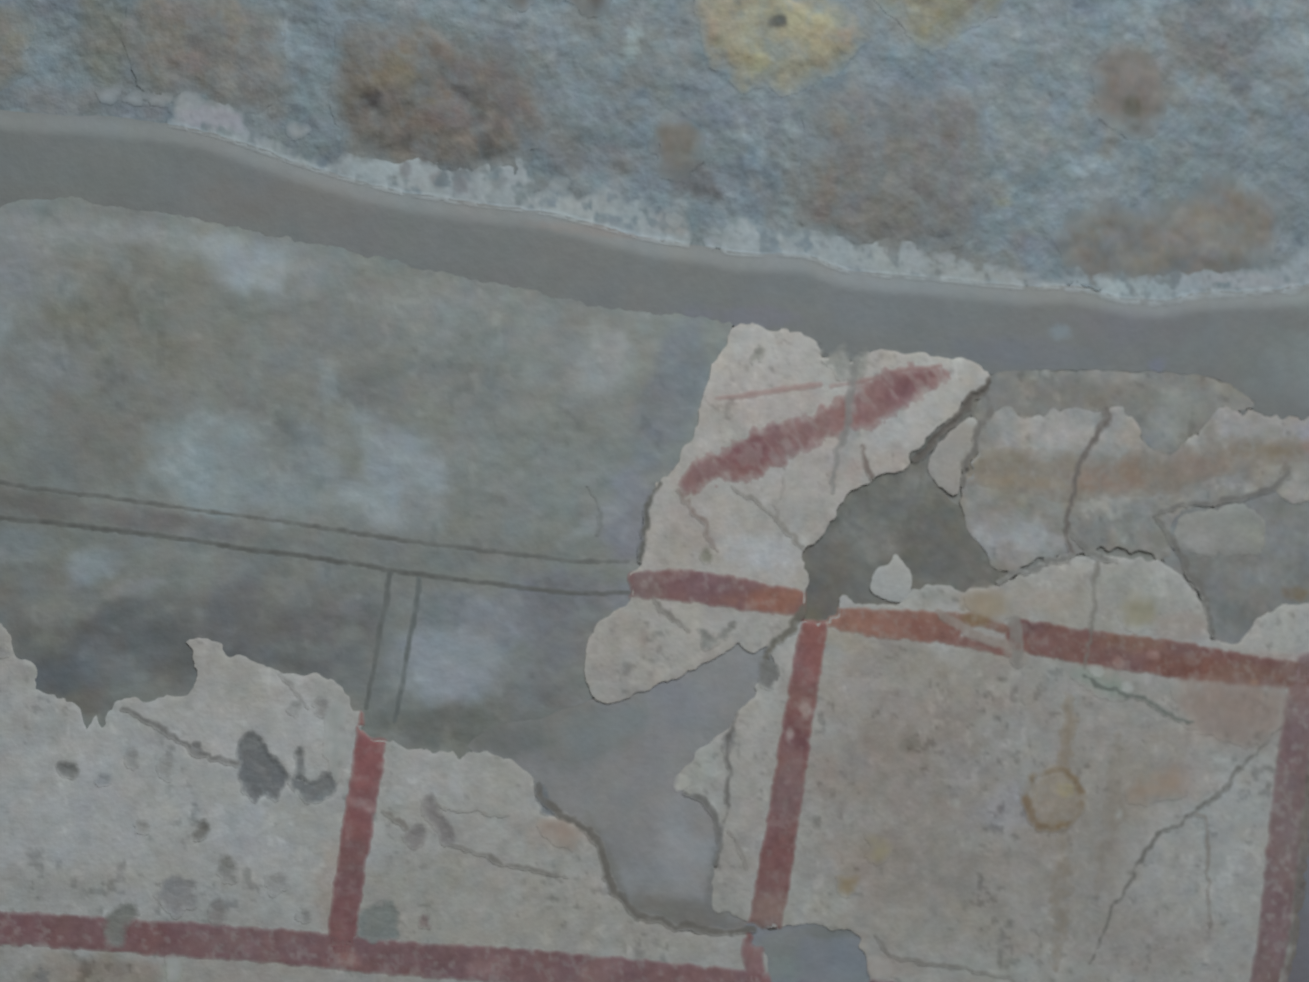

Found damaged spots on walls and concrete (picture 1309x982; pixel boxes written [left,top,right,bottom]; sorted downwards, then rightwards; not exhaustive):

damp [556,0,612,18]
damp [1087,47,1167,140]
damp [95,85,1309,307]
crack [996,405,1196,725]
crack [1153,469,1291,638]
spalling [697,620,738,651]
crack [935,607,1025,669]
spalling [757,654,780,691]
spalling [401,792,457,850]
crack [1088,725,1283,964]
spalling [356,898,401,945]
crack [873,933,1016,982]